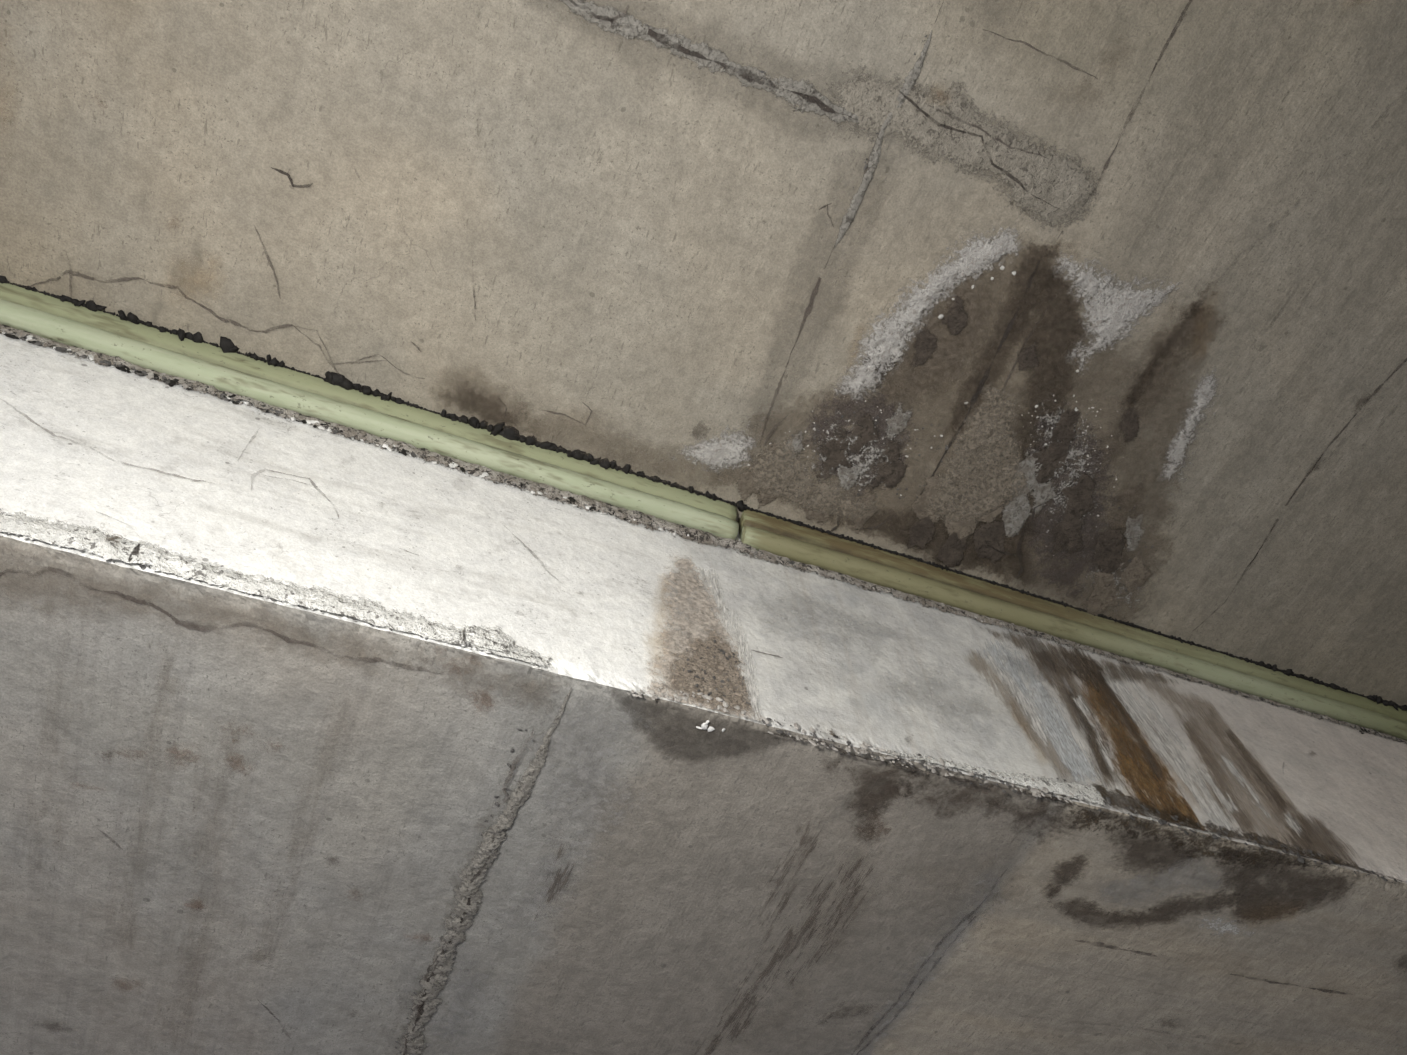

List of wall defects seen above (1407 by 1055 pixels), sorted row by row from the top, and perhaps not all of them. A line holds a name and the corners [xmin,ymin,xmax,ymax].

crack [560,0,943,376]
leakage [645,228,1224,622]
crack [1250,359,1407,564]
crack [395,687,572,1055]
leakage [695,853,872,1055]
leakage [847,628,1360,935]
corrosion [1069,663,1205,831]